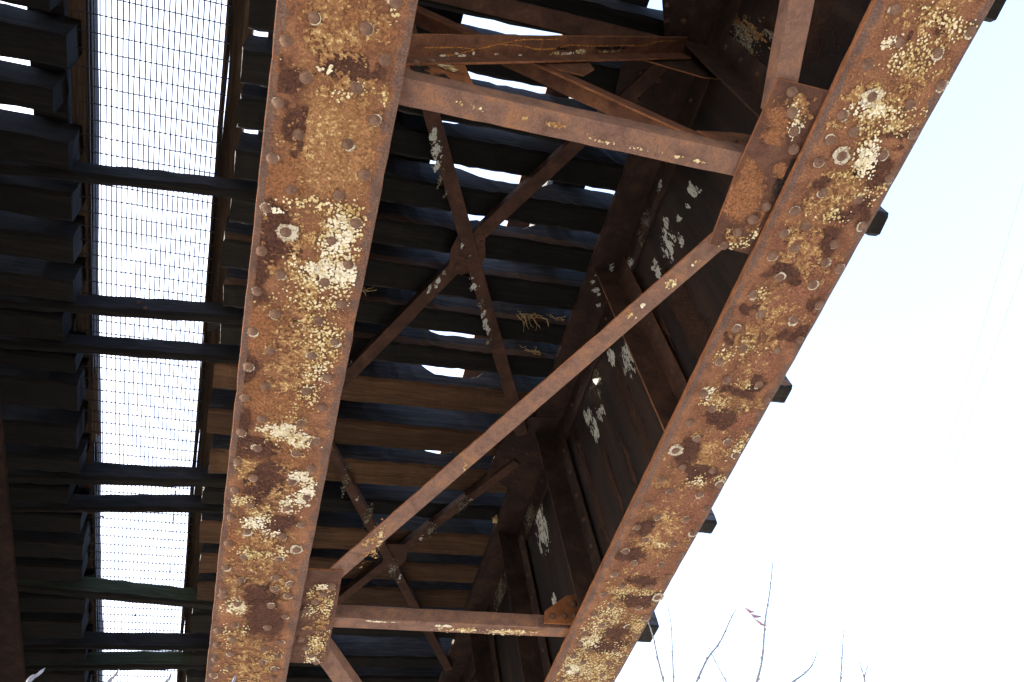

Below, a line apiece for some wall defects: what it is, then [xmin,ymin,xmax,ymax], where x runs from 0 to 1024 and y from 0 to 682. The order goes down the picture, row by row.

corrosion [292,0,399,55]
corrosion [764,0,780,44]
corrosion [804,0,831,59]
corrosion [265,75,379,219]
corrosion [721,156,788,229]
peeling [213,0,400,682]
corrosion [651,284,710,357]
peeling [554,0,978,682]
corrosion [730,222,851,385]
corrosion [242,375,313,424]
corrosion [610,484,716,579]
peeling [435,625,554,636]